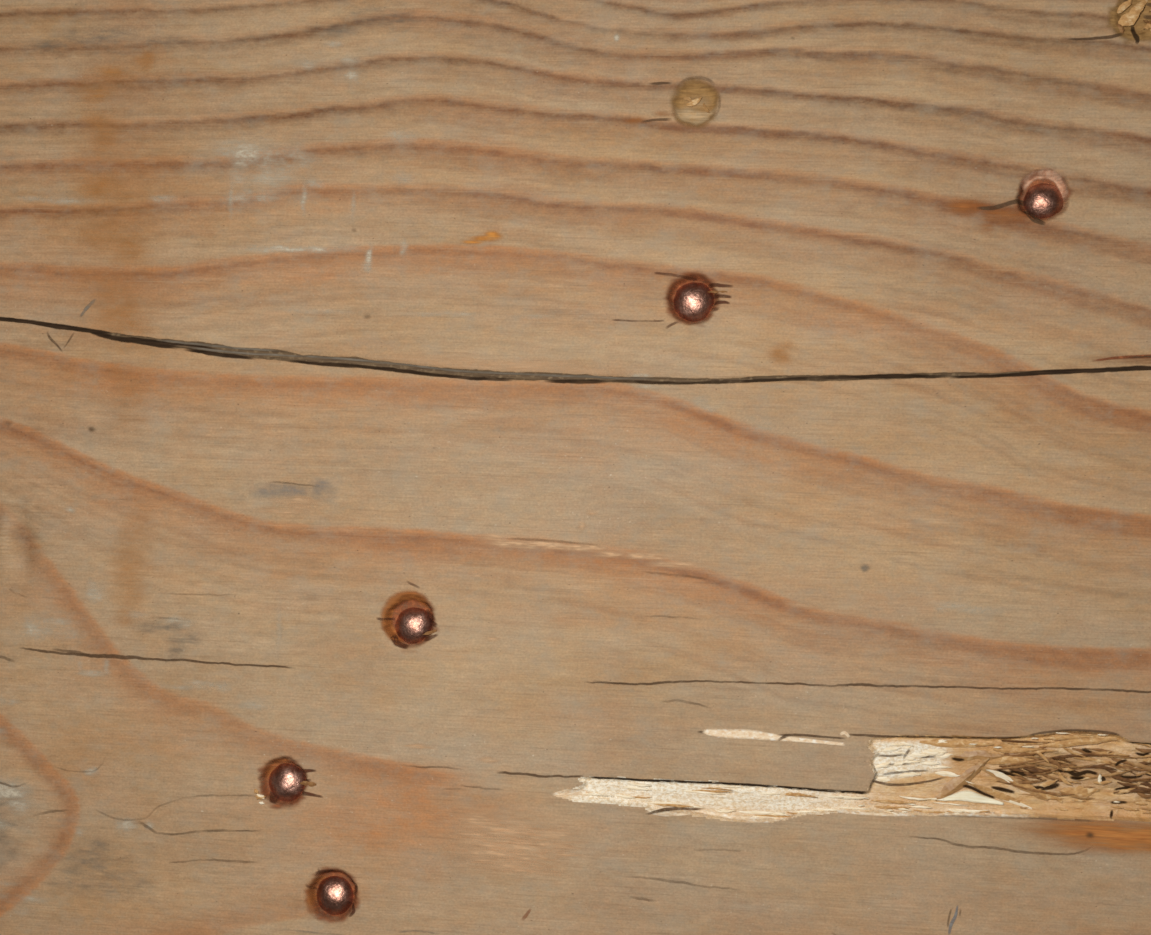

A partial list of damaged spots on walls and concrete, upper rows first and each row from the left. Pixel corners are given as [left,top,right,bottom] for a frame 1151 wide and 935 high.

crack [0,305,1151,384]
crack [28,648,288,668]
crack [593,680,1151,693]
spalling [554,729,1151,823]